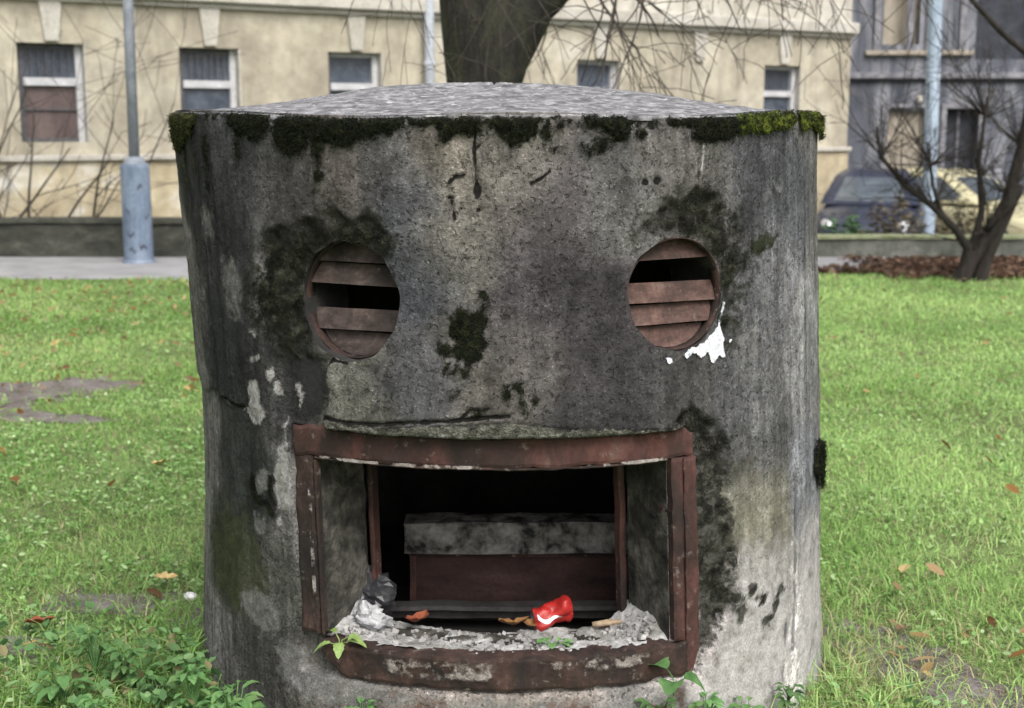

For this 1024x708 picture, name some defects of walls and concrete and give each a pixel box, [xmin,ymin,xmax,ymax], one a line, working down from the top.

spalling [629,175,759,353]
damp [248,338,328,424]
damp [662,483,822,708]